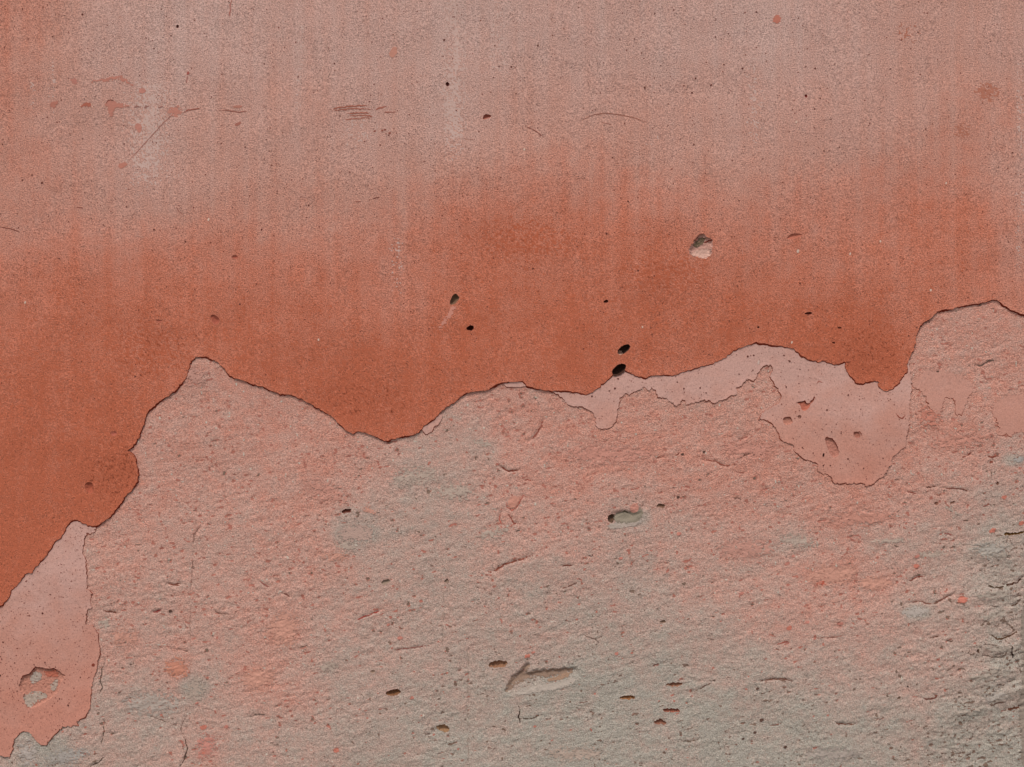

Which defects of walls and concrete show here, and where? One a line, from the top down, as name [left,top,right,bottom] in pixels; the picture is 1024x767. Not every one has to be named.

spalling [689,233,713,259]
flaking render [0,300,1024,767]